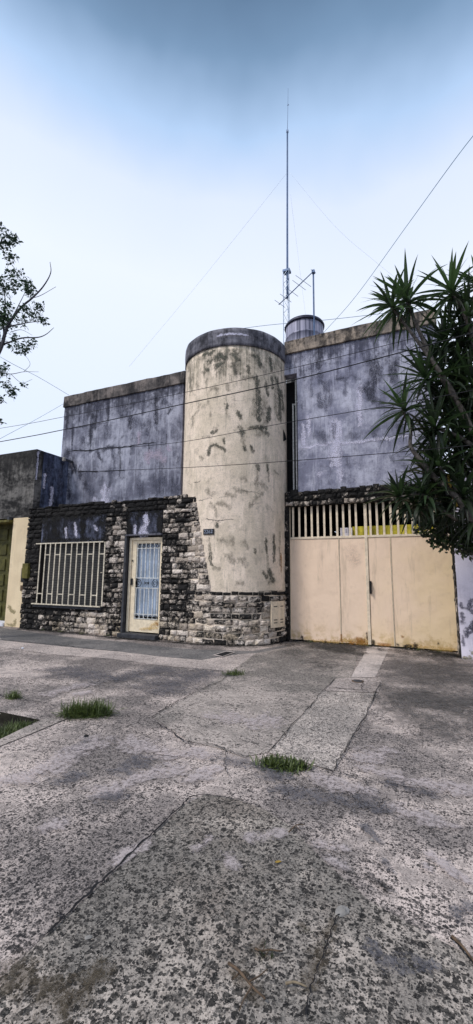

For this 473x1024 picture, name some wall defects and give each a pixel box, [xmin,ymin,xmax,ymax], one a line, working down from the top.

leakage [35,396,171,543]
leakage [187,348,284,507]
leakage [300,347,408,482]
leakage [208,523,281,584]
crack [155,670,447,796]
crack [43,797,189,936]